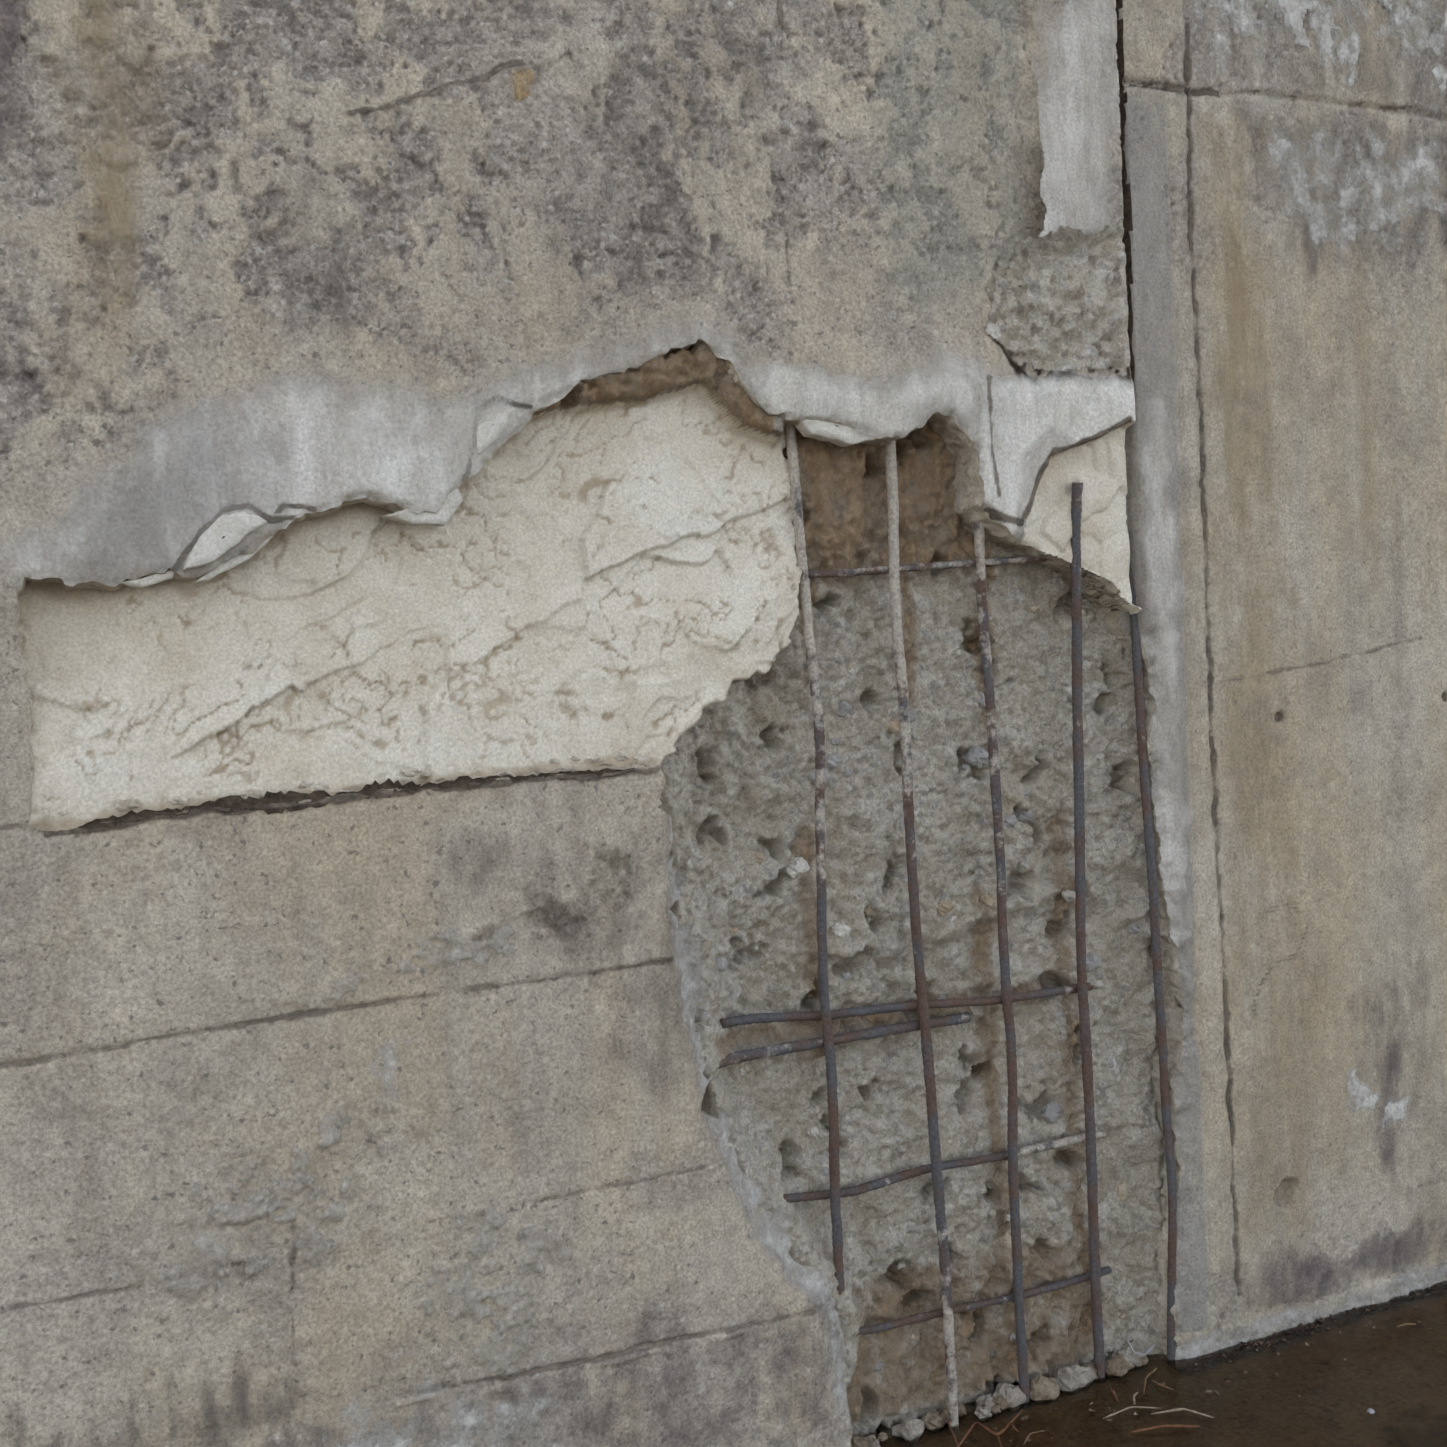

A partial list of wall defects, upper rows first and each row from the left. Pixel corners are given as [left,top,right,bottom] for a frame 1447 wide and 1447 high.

spalling [984,0,1130,371]
leakage [1122,104,1169,335]
crack [1355,103,1412,112]
rust [783,422,992,685]
spalling [6,327,1186,1438]
crack [0,1056,51,1068]
crack [214,995,426,1029]
rust [937,924,1004,1163]
leakage [1347,1069,1408,1120]
rust [848,1243,1093,1420]
leakage [1175,1220,1447,1366]
leakage [441,1398,547,1447]